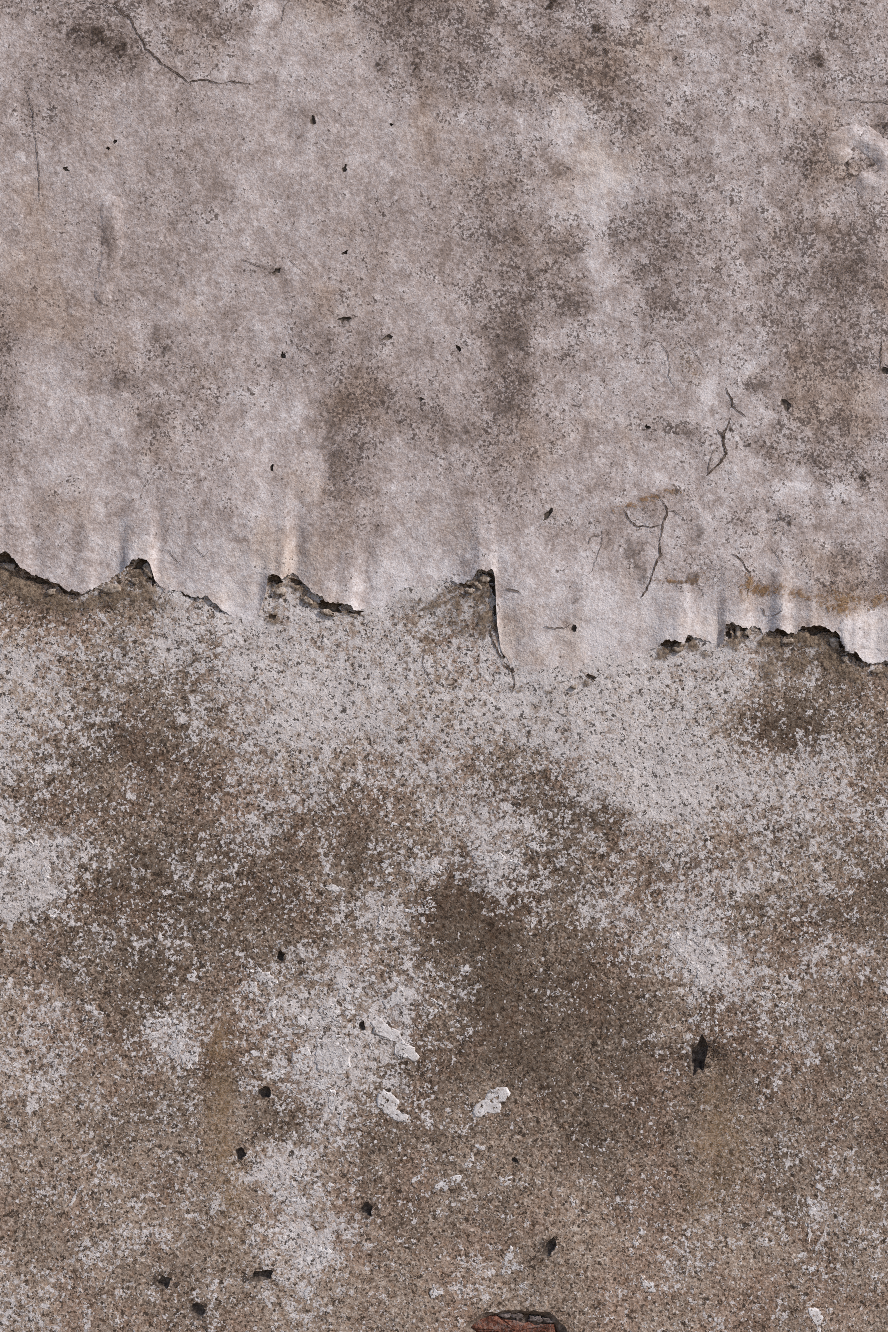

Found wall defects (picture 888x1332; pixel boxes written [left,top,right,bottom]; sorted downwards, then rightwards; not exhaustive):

damp [69,17,137,62]
crack [61,0,250,84]
damp [587,23,637,126]
damp [720,418,871,482]
crack [584,494,681,597]
spalling [0,554,191,619]
spalling [403,572,497,641]
spalling [655,637,710,661]
spalling [725,624,888,691]
peeling [241,943,420,1133]
peeling [472,1087,510,1118]
spalling [465,1310,569,1332]